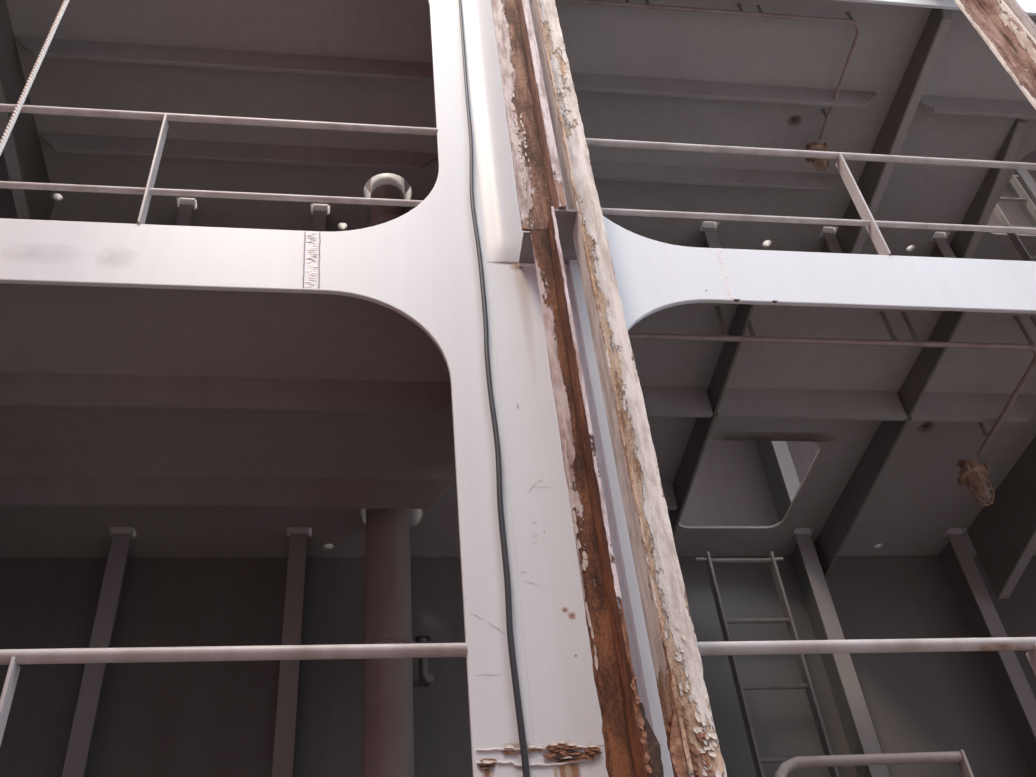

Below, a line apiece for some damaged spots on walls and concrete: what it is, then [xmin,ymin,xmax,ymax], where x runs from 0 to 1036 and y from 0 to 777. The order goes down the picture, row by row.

peeling [528,741,596,759]
peeling [664,622,721,777]